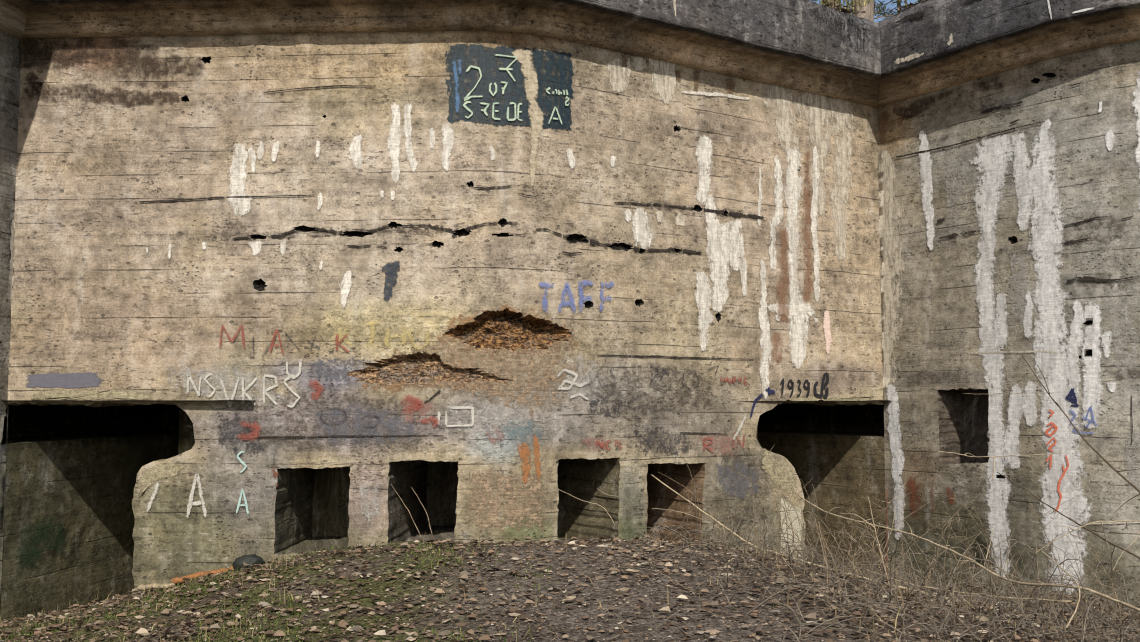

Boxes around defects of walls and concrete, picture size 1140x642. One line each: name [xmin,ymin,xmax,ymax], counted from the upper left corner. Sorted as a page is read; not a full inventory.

water stain [21,37,203,107]
crack [134,195,310,203]
crack [466,184,536,197]
crack [233,221,702,254]
spalling [166,307,802,560]